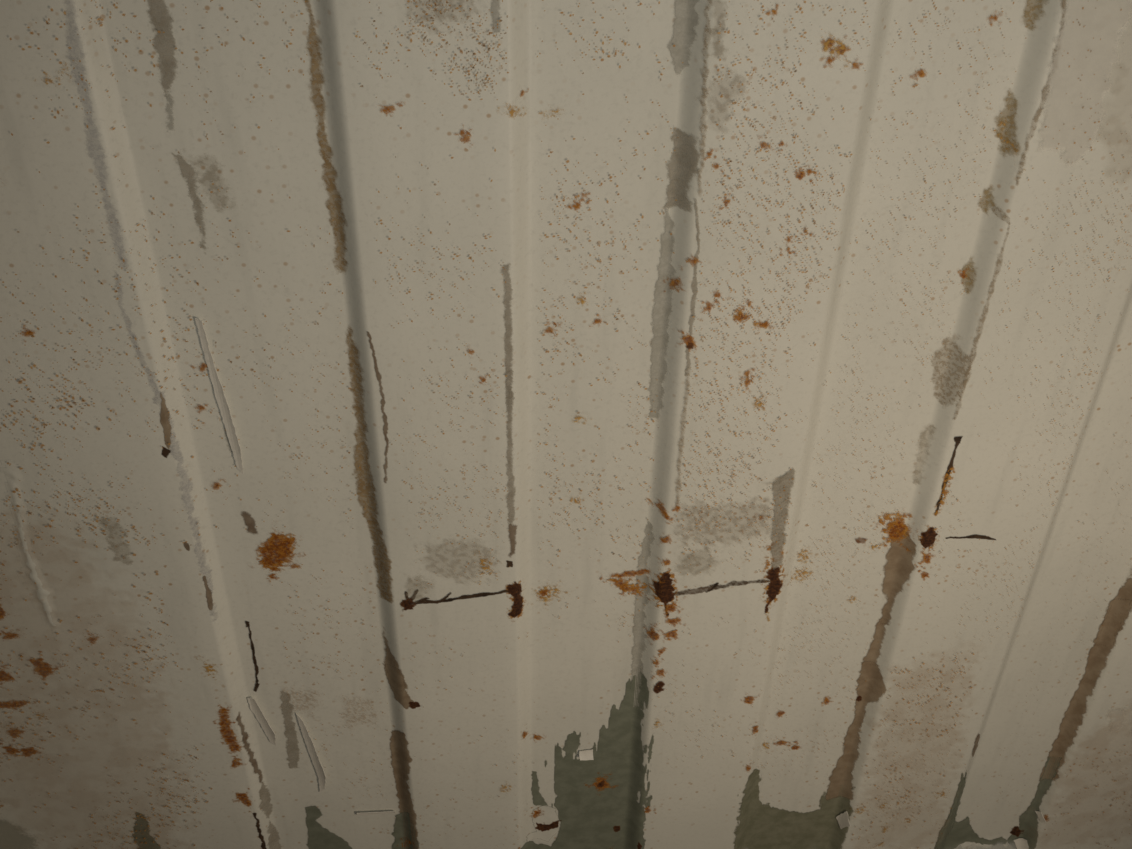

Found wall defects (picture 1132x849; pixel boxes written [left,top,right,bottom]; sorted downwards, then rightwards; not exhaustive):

peeling [305,0,347,271]
peeling [648,129,700,418]
rust [536,0,871,629]
rust [0,198,356,772]
peeling [347,328,393,603]
peeling [306,806,352,849]
peeling [356,730,419,849]
peeling [384,637,420,709]
peeling [521,521,655,849]
rust [647,603,708,700]
peeling [734,532,916,849]
peeling [934,578,1132,849]